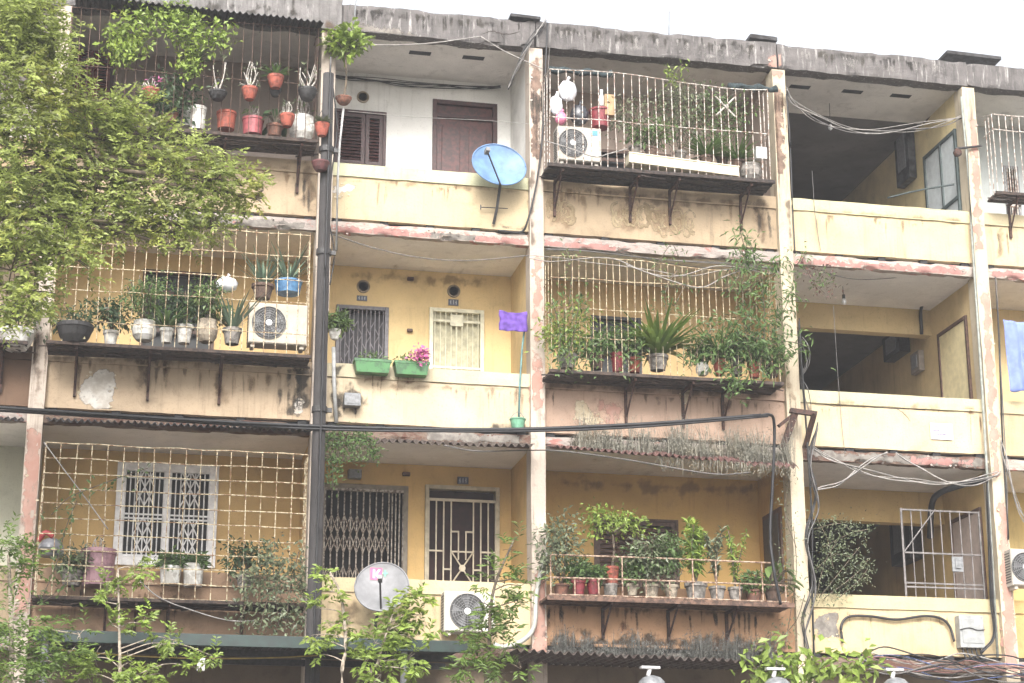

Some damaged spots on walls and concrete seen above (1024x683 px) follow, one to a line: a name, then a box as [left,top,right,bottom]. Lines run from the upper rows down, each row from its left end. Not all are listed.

water stain [555,27,761,59]
water stain [801,51,942,73]
peeling [530,58,543,159]
peeling [970,120,984,251]
peeling [332,223,524,245]
peeling [77,369,118,410]
water stain [278,365,313,417]
peeling [813,293,1001,477]
water stain [545,613,785,653]
peeling [814,613,839,641]